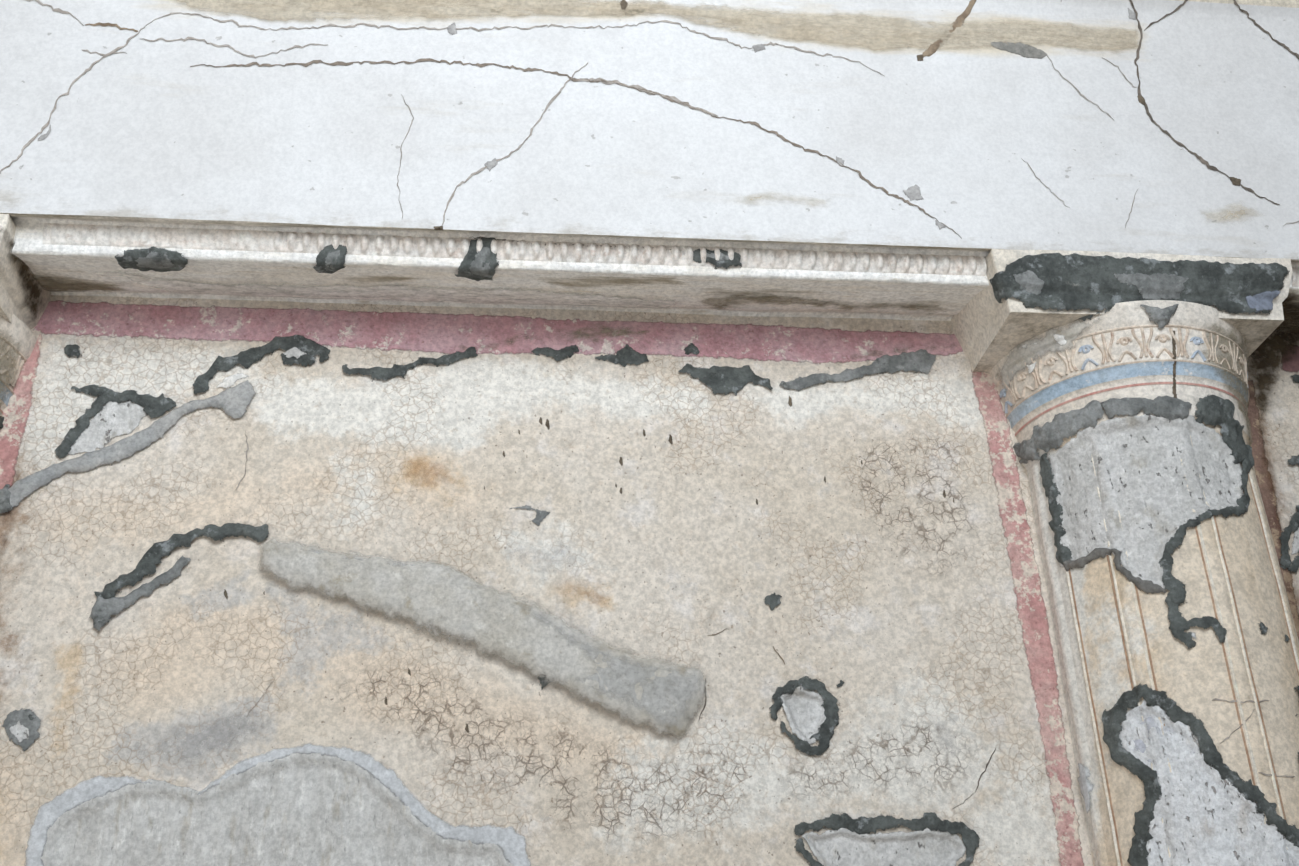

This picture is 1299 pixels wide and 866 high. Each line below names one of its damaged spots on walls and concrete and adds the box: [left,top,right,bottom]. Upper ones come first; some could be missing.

crack [0,0,962,250]
crack [1046,0,1299,224]
peeling [68,400,147,455]
peeling [216,373,249,389]
peeling [283,347,306,359]
spalling [1013,395,1255,649]
peeling [1291,528,1299,554]
spalling [26,744,531,866]
crack [372,680,740,828]
spalling [769,676,844,756]
spalling [794,812,980,866]
spalling [1102,684,1299,866]